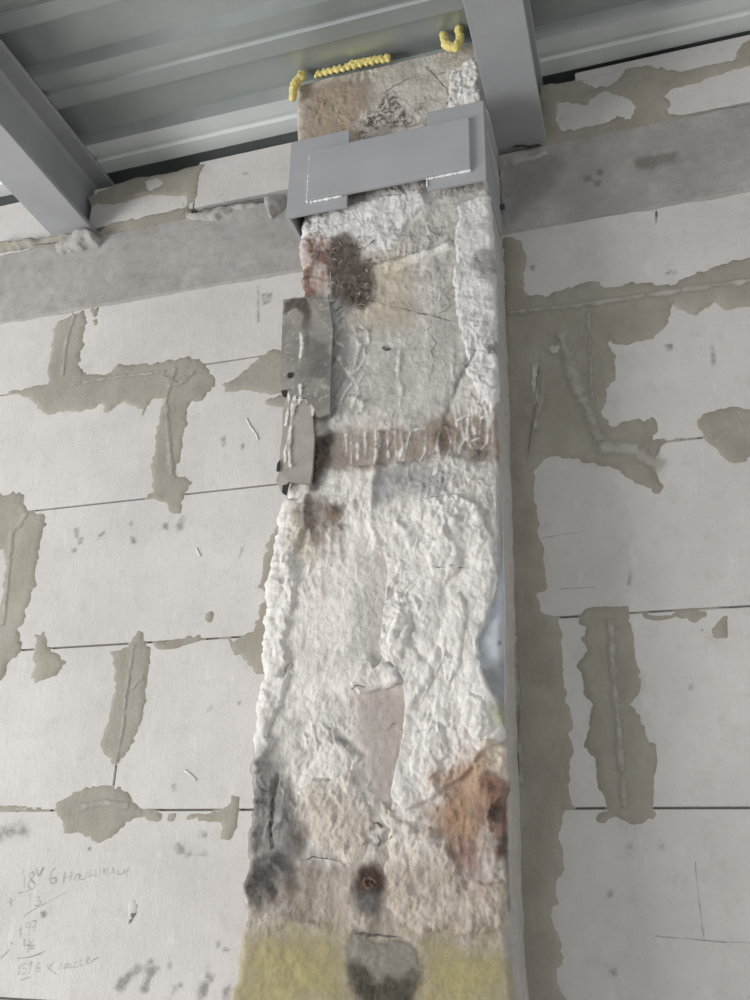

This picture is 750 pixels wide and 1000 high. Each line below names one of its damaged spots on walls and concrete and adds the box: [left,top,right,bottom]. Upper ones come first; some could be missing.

water stain [248,770,299,858]
corrosion [441,765,511,910]
corrosion [355,866,384,911]